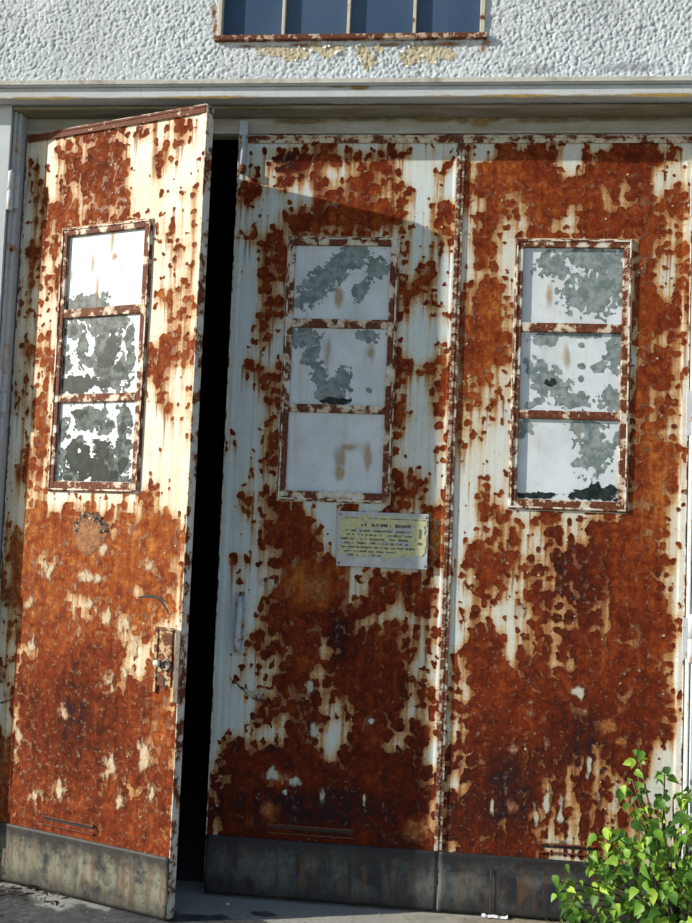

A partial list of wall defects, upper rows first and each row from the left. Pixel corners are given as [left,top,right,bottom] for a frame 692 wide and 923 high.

peeling [254,42,384,71]
peeling [399,42,457,67]
leakage [0,898,275,923]